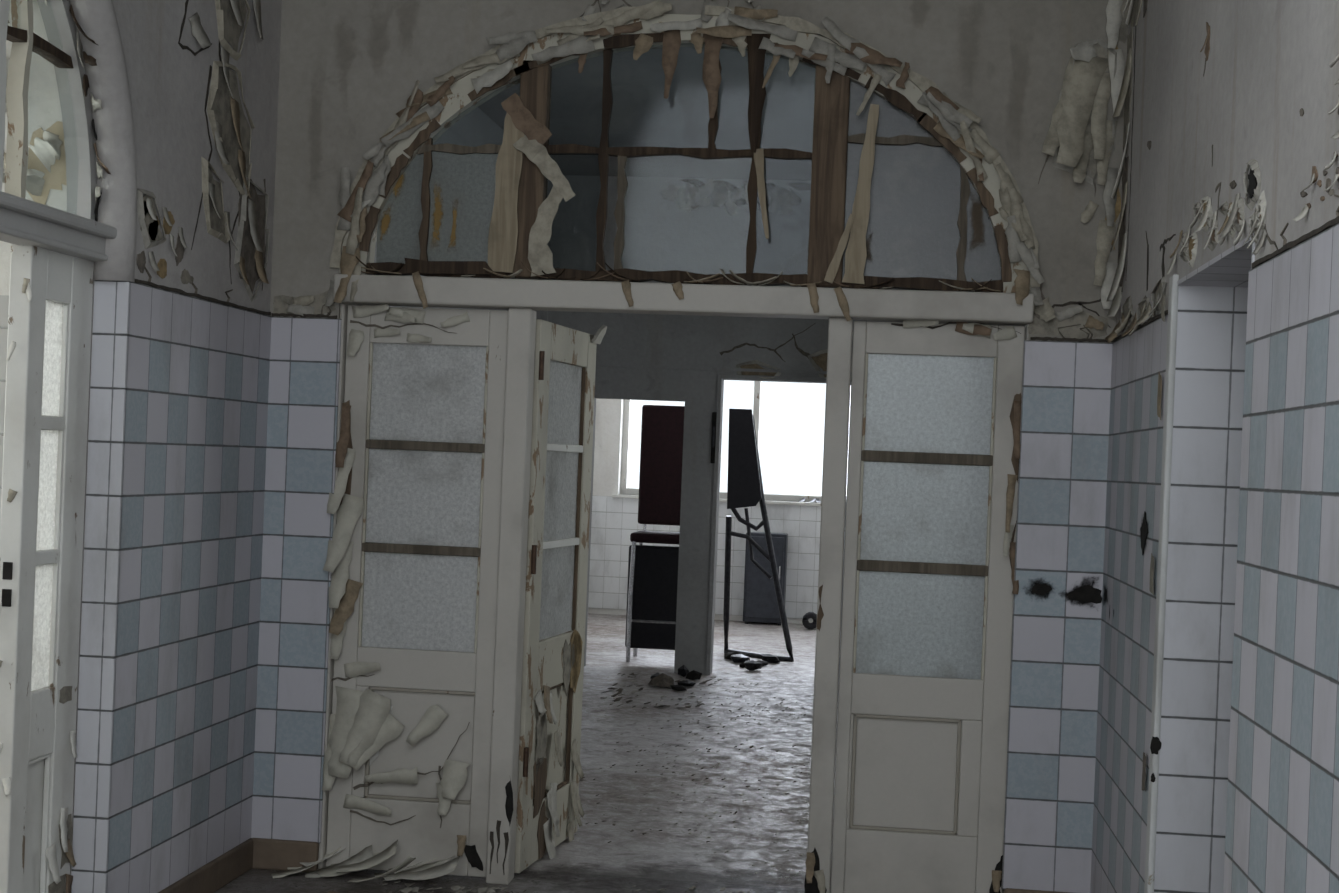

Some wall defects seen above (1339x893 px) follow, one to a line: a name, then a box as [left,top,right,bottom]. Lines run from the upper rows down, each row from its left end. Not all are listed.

peeling [136,0,1278,357]
peeling [1292,95,1339,222]
spalling [1140,511,1154,595]